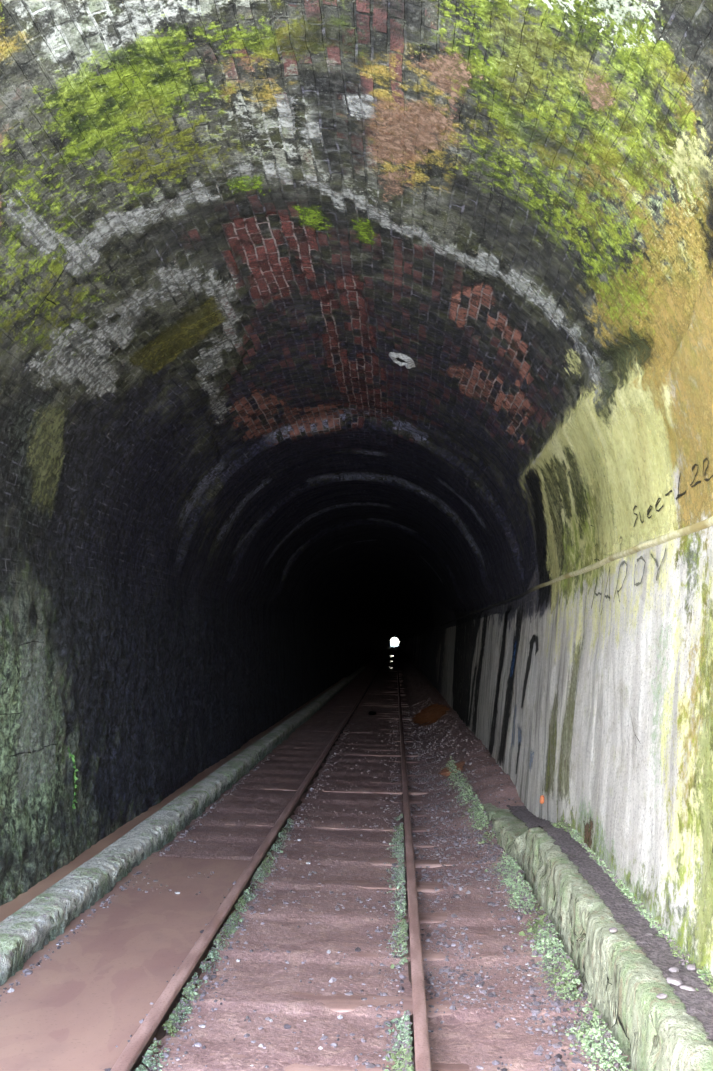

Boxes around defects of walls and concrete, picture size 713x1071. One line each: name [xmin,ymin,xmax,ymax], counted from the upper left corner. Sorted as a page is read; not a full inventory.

leakage [0,190,76,270]
leakage [29,254,242,424]
leakage [525,405,670,611]
leakage [16,628,57,808]